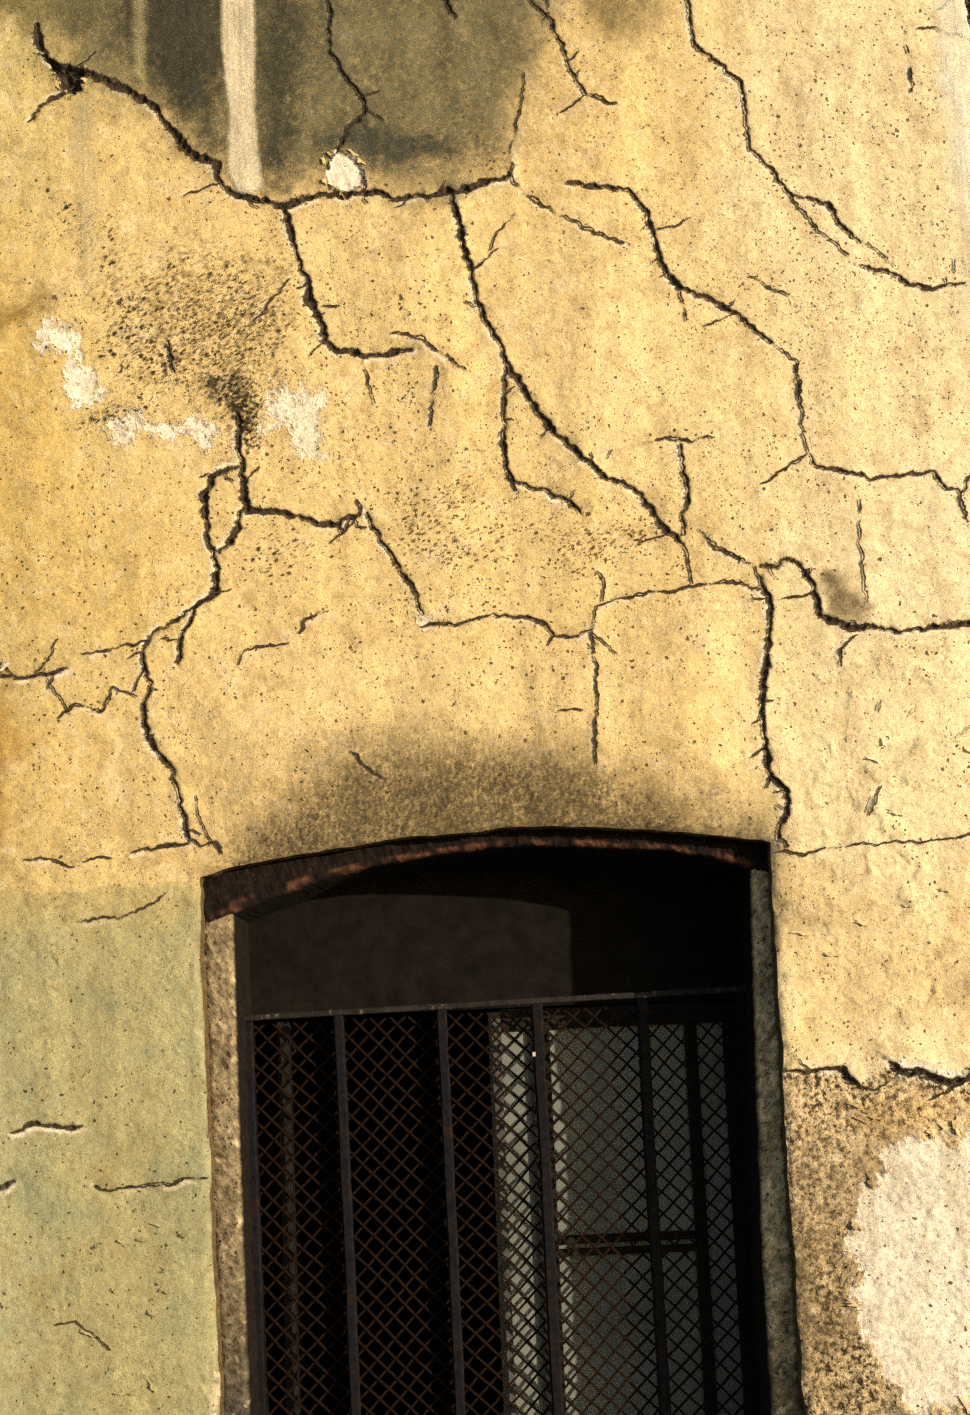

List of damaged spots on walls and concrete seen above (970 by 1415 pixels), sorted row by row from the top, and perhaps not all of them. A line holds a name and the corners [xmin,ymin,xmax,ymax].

water stain [253,0,550,195]
peeling [27,312,223,456]
water stain [65,245,293,461]
peeling [243,375,335,465]
crack [0,0,970,868]
crack [78,892,167,922]
crack [789,1052,970,1101]
crack [11,1120,83,1134]
crack [0,1180,15,1191]
crack [94,1176,208,1192]
peeling [835,1114,970,1415]
crack [56,1320,111,1351]